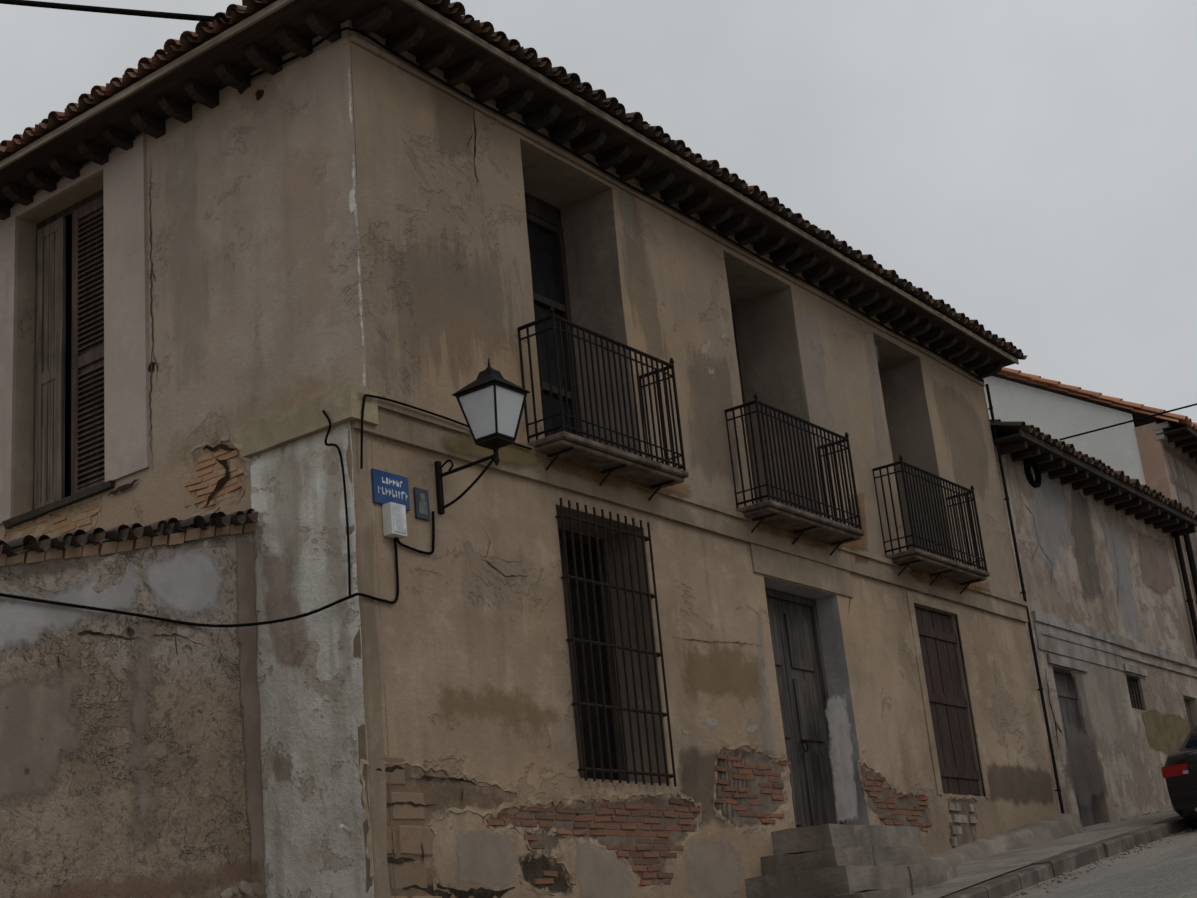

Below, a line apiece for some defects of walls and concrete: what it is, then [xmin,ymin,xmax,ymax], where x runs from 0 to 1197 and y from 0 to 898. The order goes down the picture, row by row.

crack [467,109,478,181]
flaking render [2,479,139,542]
flaking render [184,435,250,516]
flaking render [359,724,792,898]
flaking render [858,759,979,848]
crack [403,883,515,898]